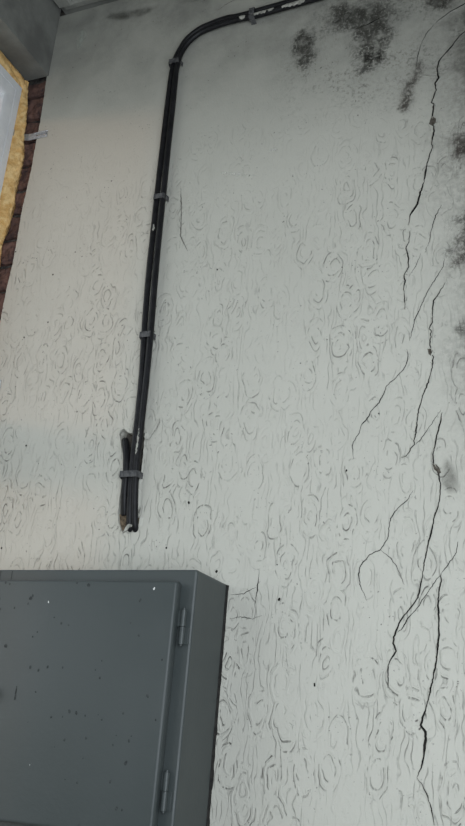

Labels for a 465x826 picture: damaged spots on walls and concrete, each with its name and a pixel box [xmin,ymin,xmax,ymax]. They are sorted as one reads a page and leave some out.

water stain [294,30,313,66]
water stain [333,5,390,60]
water stain [455,137,465,155]
crack [352,4,465,825]